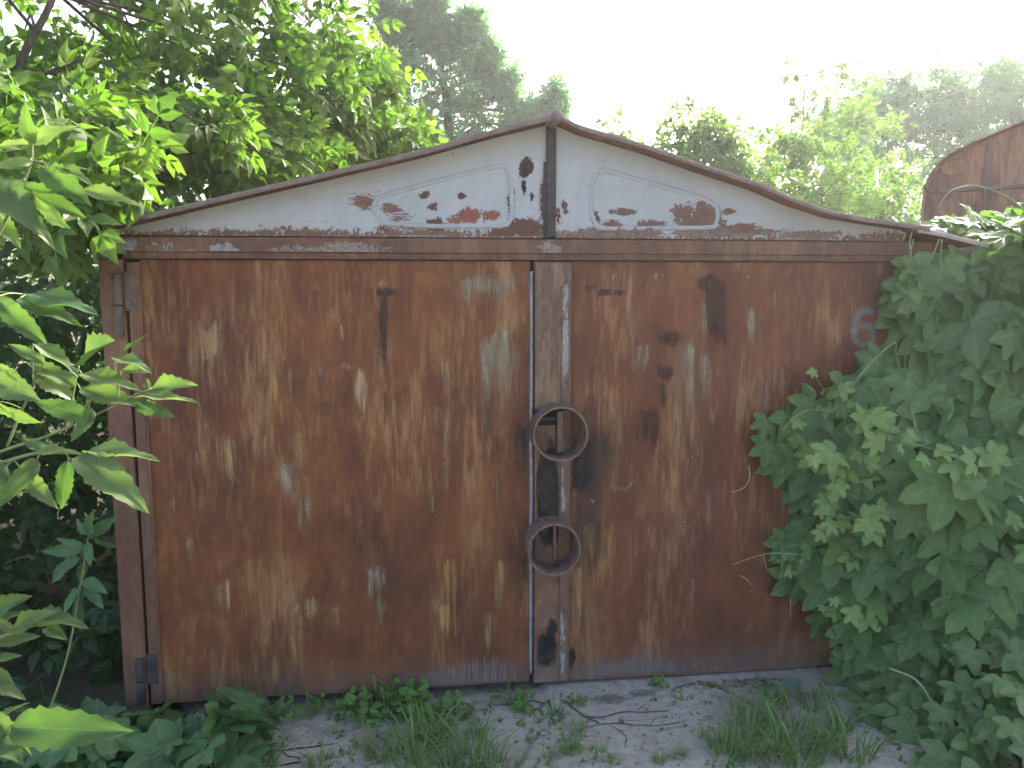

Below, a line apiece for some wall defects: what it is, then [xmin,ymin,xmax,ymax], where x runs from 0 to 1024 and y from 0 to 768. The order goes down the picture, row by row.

peeling [259,179,563,253]
peeling [556,199,569,225]
peeling [594,200,762,235]
peeling [117,238,239,251]
corrosion [377,280,400,364]
corrosion [699,274,726,345]
corrosion [355,369,366,412]
corrosion [217,437,235,478]
corrosion [439,559,463,635]